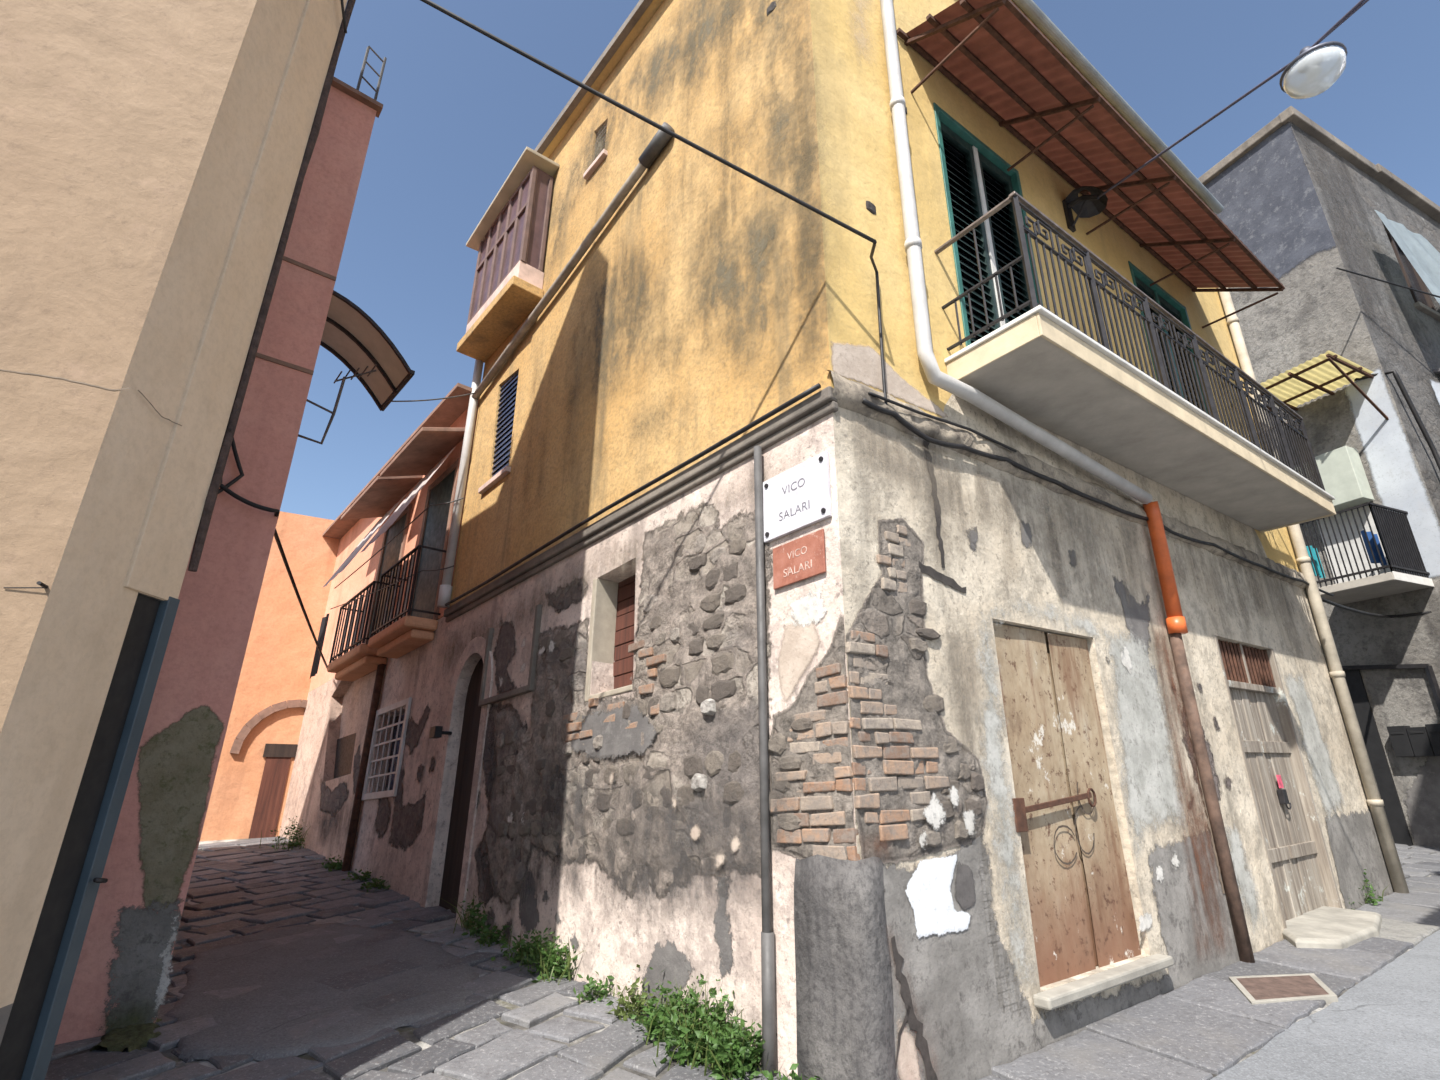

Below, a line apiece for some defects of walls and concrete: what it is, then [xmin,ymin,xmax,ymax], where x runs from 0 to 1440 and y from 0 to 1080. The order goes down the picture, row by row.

leakage [631,0,740,102]
leakage [572,133,607,174]
leakage [593,256,646,382]
leakage [701,219,778,342]
flaking render [320,745,361,819]
flaking render [374,705,436,854]
flaking render [474,502,988,978]
flaking render [137,706,224,1022]